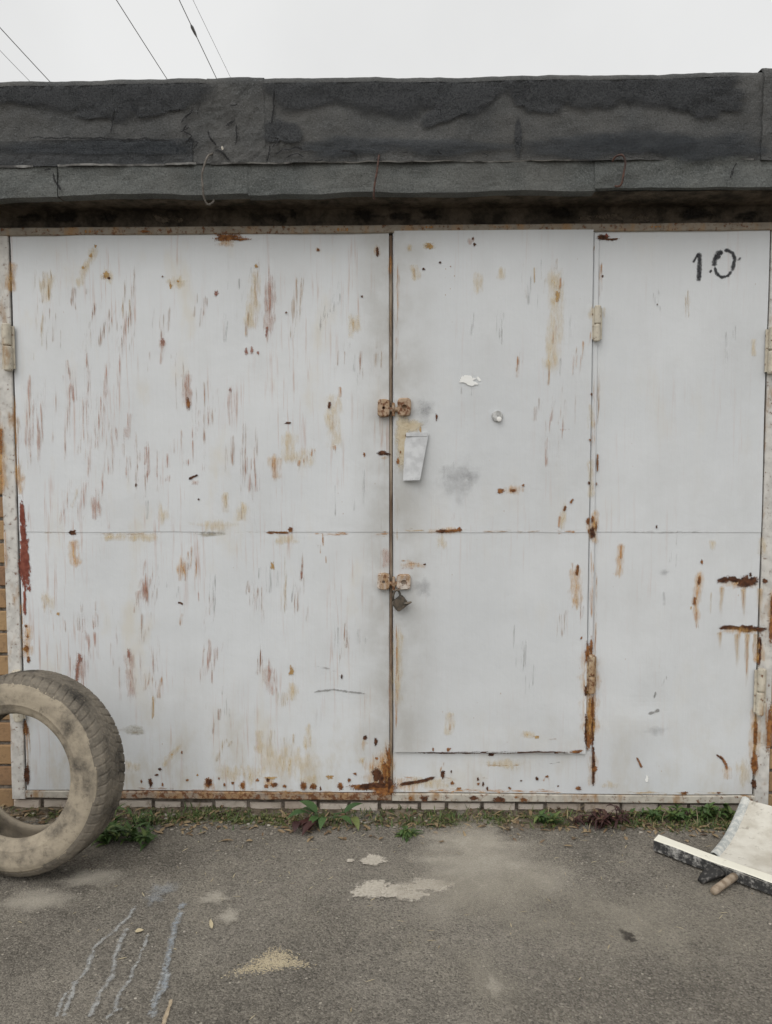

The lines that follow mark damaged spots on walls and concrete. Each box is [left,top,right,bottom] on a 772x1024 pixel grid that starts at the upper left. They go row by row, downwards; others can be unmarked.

rust [214,233,251,242]
rust [717,573,768,595]
rust [580,636,593,663]
rust [720,596,772,671]
rust [186,735,398,798]
rust [409,770,560,803]
rust [415,685,598,790]
rust [751,704,772,789]